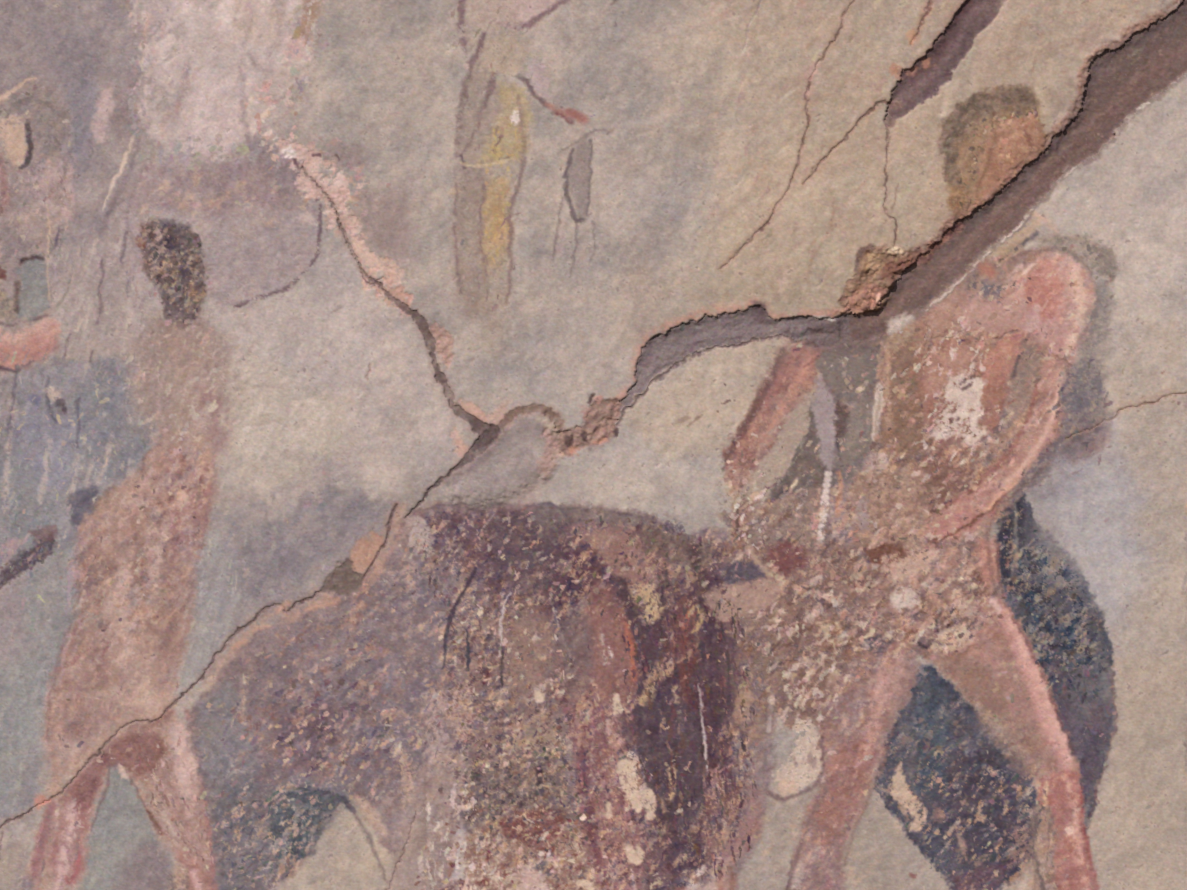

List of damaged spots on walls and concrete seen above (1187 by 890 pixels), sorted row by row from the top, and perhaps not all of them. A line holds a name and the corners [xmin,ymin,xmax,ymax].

crack [276,137,565,583]
spalling [555,399,622,459]
spalling [838,221,964,316]
crack [620,0,1187,413]
crack [0,591,322,857]